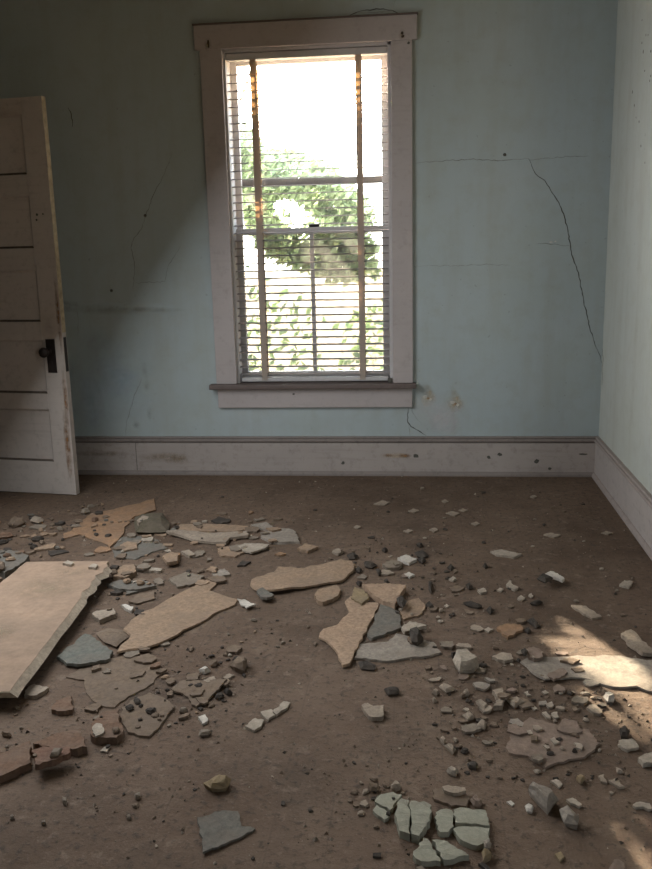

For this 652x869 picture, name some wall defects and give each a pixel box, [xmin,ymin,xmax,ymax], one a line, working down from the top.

crack [421,156,603,367]